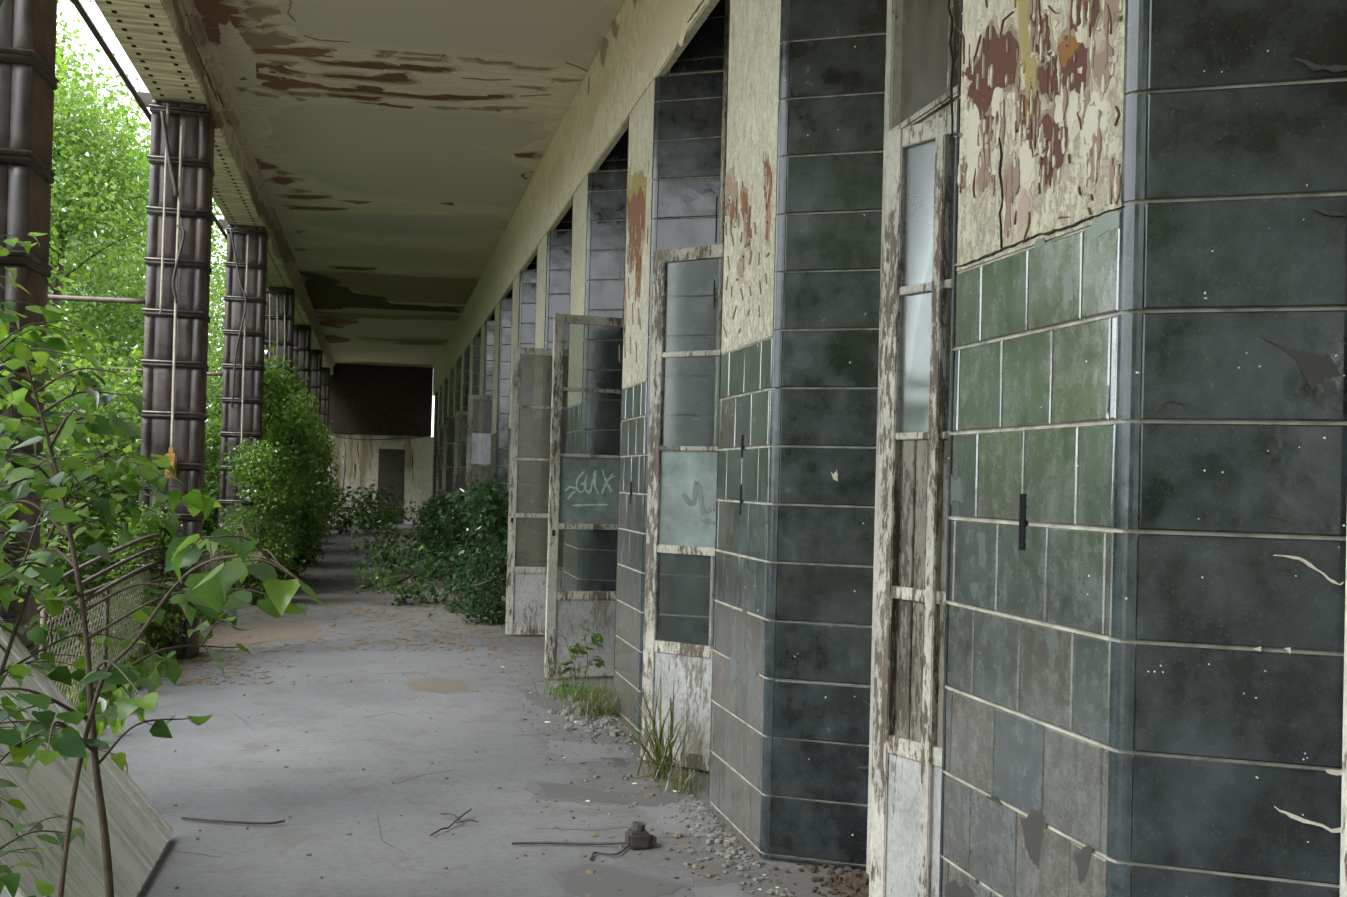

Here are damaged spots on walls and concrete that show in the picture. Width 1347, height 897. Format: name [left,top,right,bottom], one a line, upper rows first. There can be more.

peeling [189,0,356,101]
peeling [957,0,1124,248]
crack [1113,106,1121,126]
rust [626,161,647,216]
crack [954,114,1125,267]